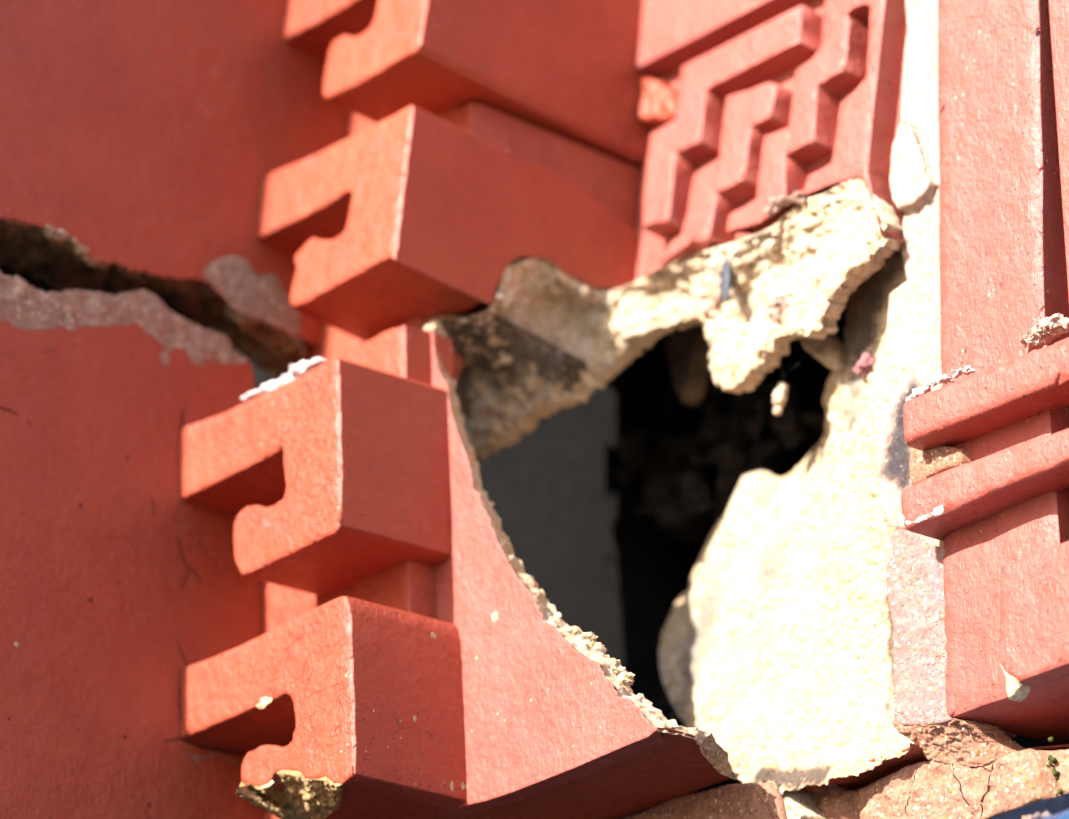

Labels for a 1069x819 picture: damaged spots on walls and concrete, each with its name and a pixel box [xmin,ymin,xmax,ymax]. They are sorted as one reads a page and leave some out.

spalling [424,317,678,729]
spalling [236,770,344,819]
crack [905,757,1000,819]